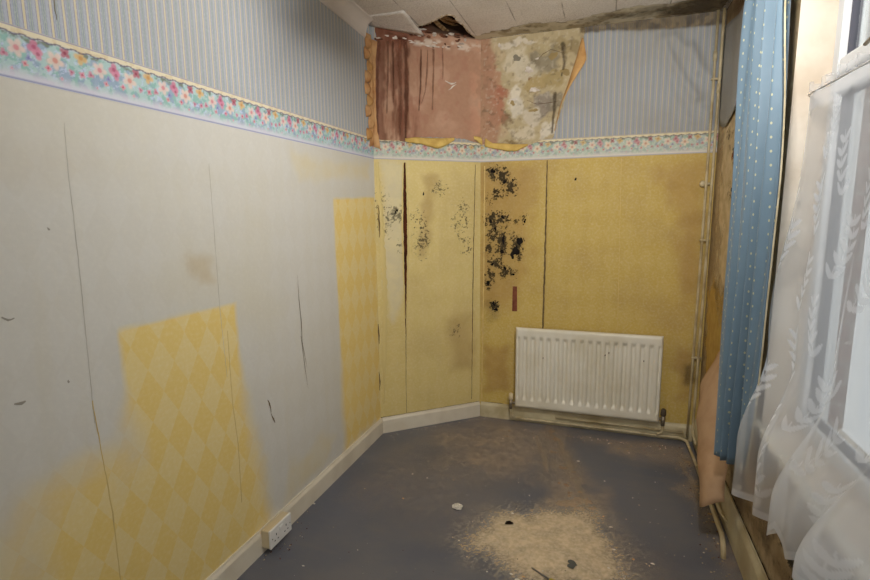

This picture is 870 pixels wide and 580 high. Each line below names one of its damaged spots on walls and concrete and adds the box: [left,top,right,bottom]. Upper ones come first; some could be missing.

flaking render [364,16,585,149]
leakage [580,0,745,33]
leakage [0,144,448,580]
leakage [438,160,546,397]